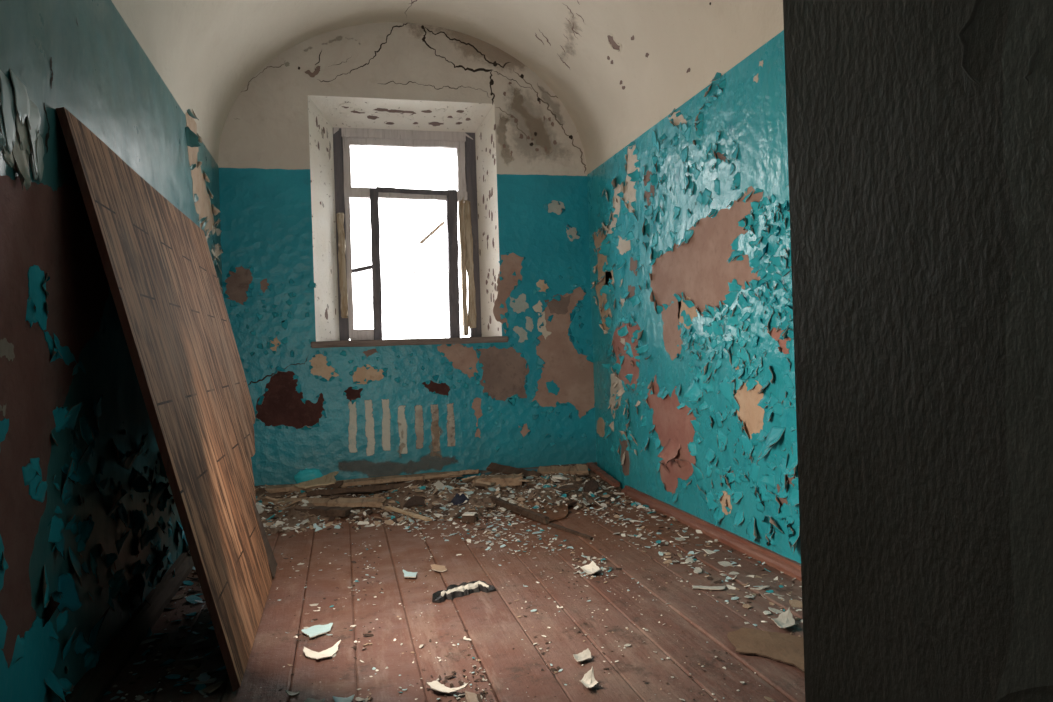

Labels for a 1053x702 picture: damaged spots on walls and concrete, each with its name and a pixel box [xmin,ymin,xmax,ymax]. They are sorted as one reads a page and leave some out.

peeling [0,69,191,702]
crack [315,0,586,173]
peeling [185,72,800,554]
flaking render [606,32,634,64]